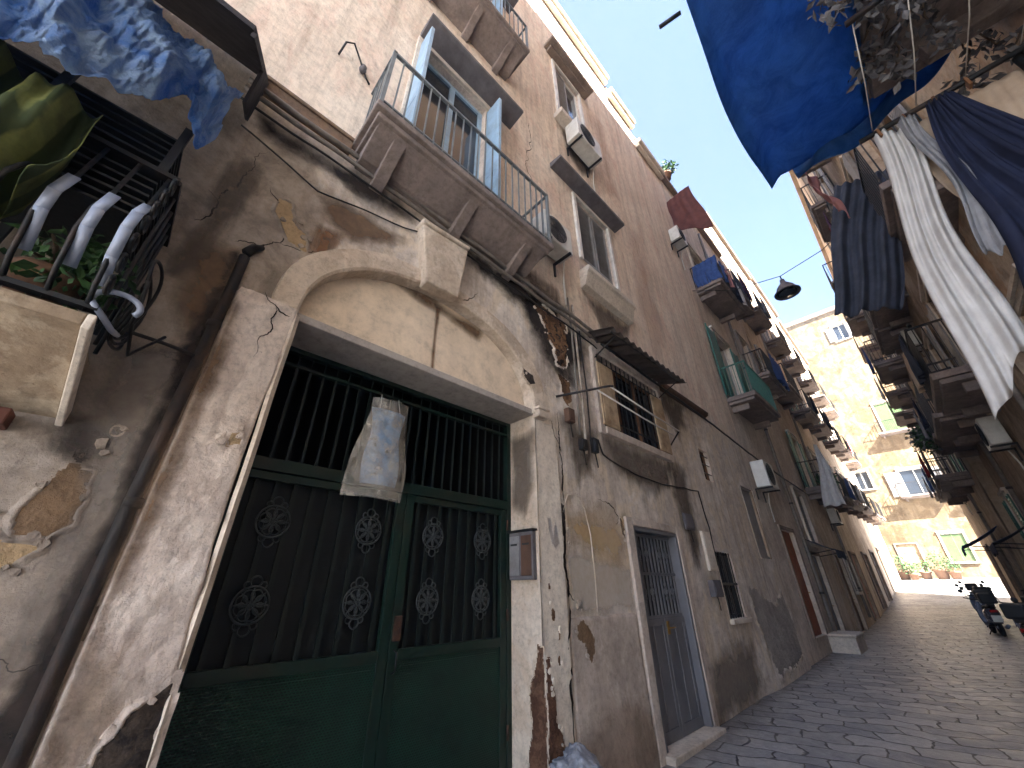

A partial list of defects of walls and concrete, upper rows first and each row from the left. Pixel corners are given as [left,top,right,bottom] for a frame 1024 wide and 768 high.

damp [169,161,257,331]
crack [257,292,289,352]
spalling [533,304,573,408]
peeling [0,424,129,576]
crack [550,412,576,742]
peeling [548,577,597,665]
spalling [76,669,185,768]
spalling [525,643,566,768]